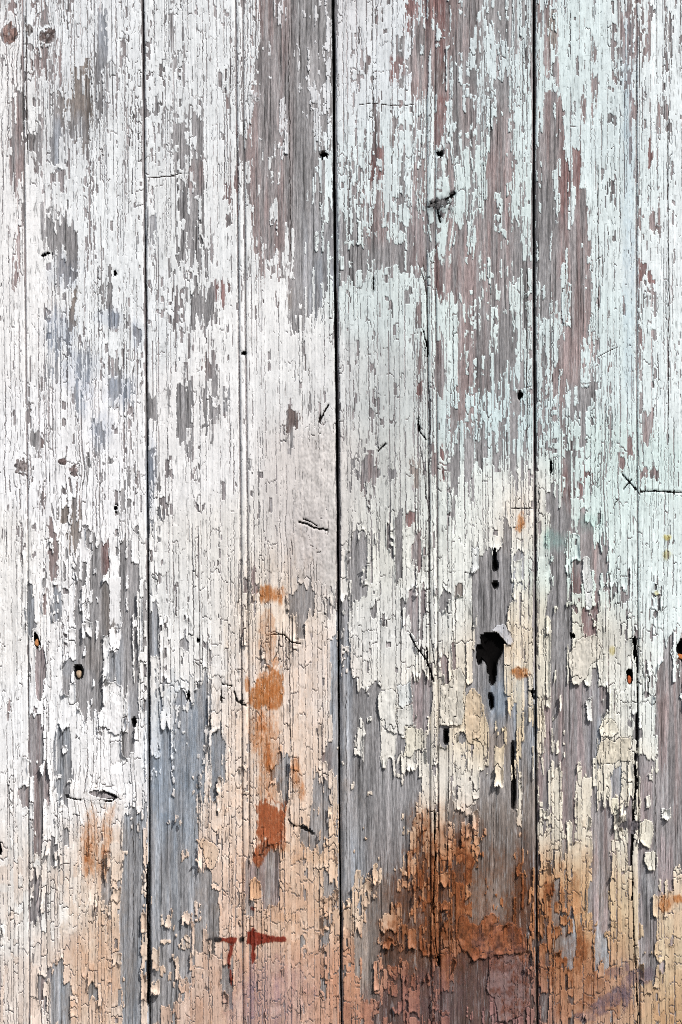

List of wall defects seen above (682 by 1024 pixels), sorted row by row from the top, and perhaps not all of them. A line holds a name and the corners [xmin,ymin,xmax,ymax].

peeling [2,0,236,1024]
crack [299,519,326,530]
peeling [223,0,682,1024]
crack [613,474,682,507]
rust [253,799,285,865]